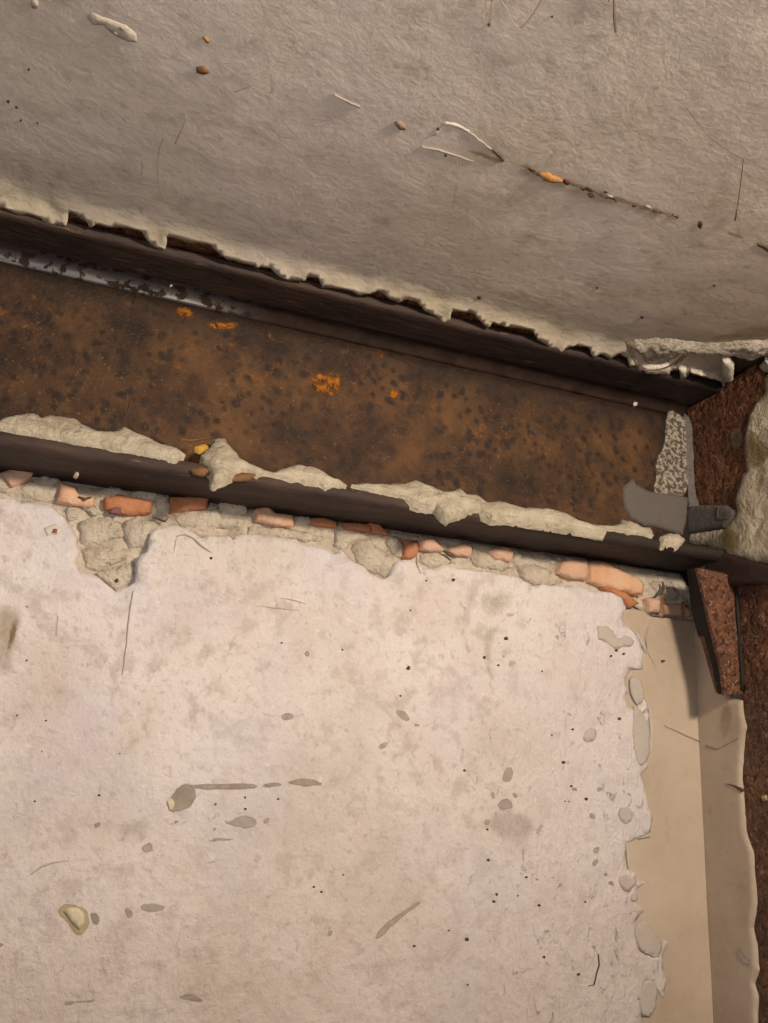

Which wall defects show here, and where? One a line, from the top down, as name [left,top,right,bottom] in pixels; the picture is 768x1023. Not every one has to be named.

rust [312,374,340,395]
rust [190,467,210,477]
rust [232,472,256,482]
peeling [0,470,760,1023]